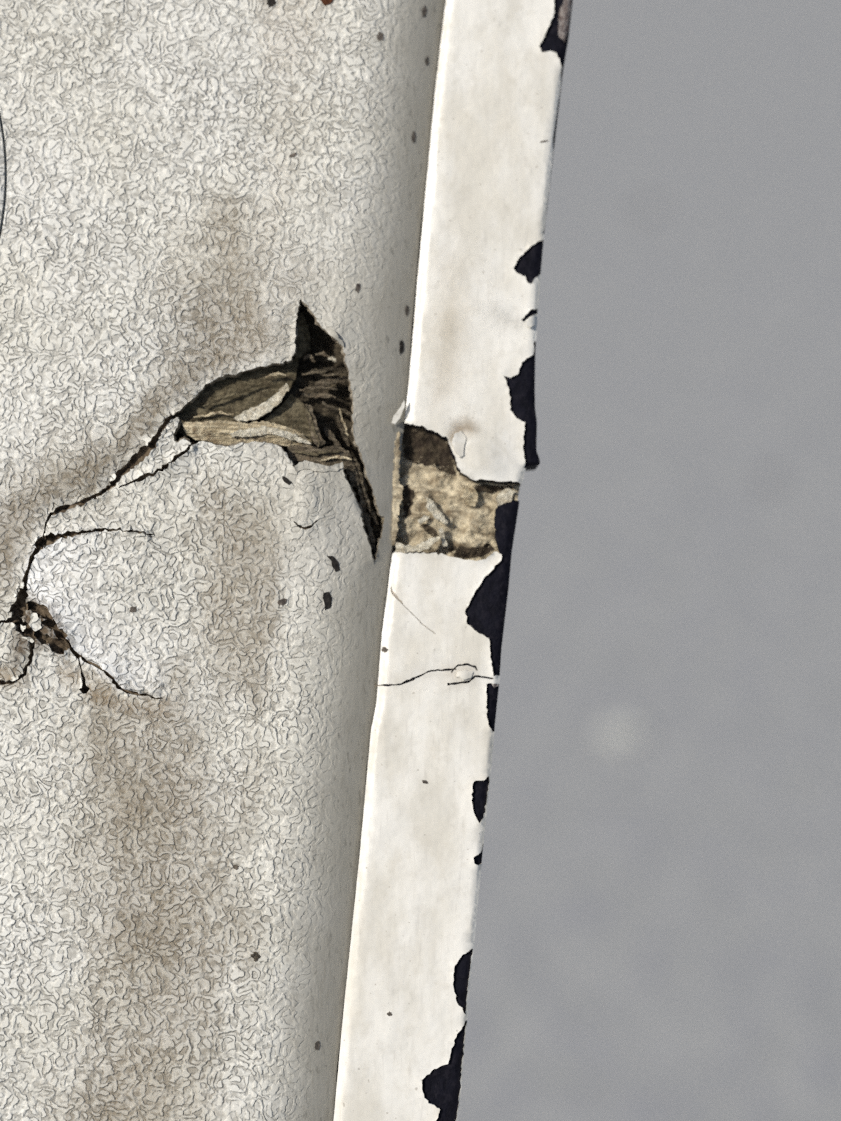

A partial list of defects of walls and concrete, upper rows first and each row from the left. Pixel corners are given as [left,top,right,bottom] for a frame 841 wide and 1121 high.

crack [0,415,198,698]
spalling [244,303,520,732]
peeling [505,342,540,468]
peeling [522,309,538,328]